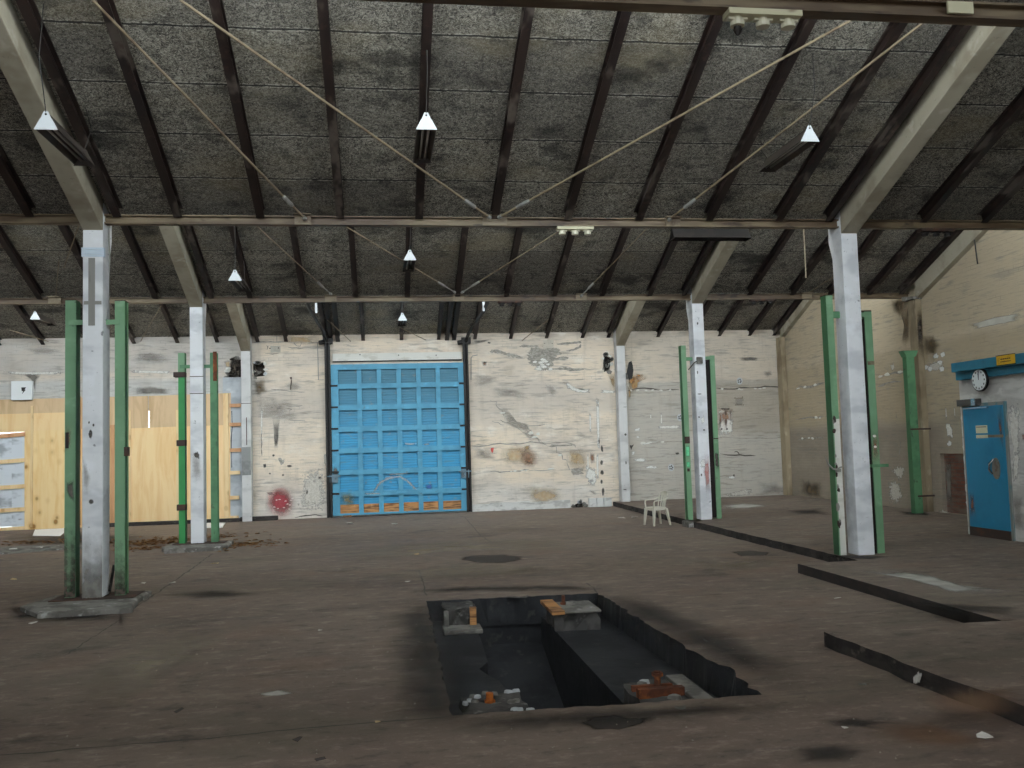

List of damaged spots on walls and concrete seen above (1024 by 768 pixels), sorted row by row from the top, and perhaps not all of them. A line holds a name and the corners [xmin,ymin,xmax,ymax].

peeling [490,341,584,371]